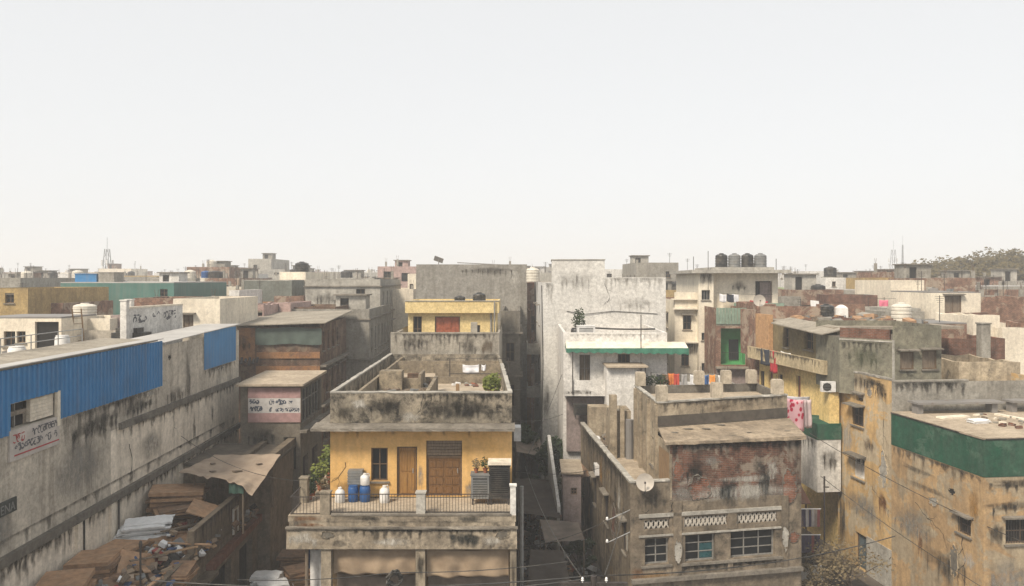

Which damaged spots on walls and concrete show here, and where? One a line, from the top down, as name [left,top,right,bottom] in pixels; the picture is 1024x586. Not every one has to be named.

leakage [72,384,231,450]
leakage [329,400,416,420]
leakage [430,393,507,416]